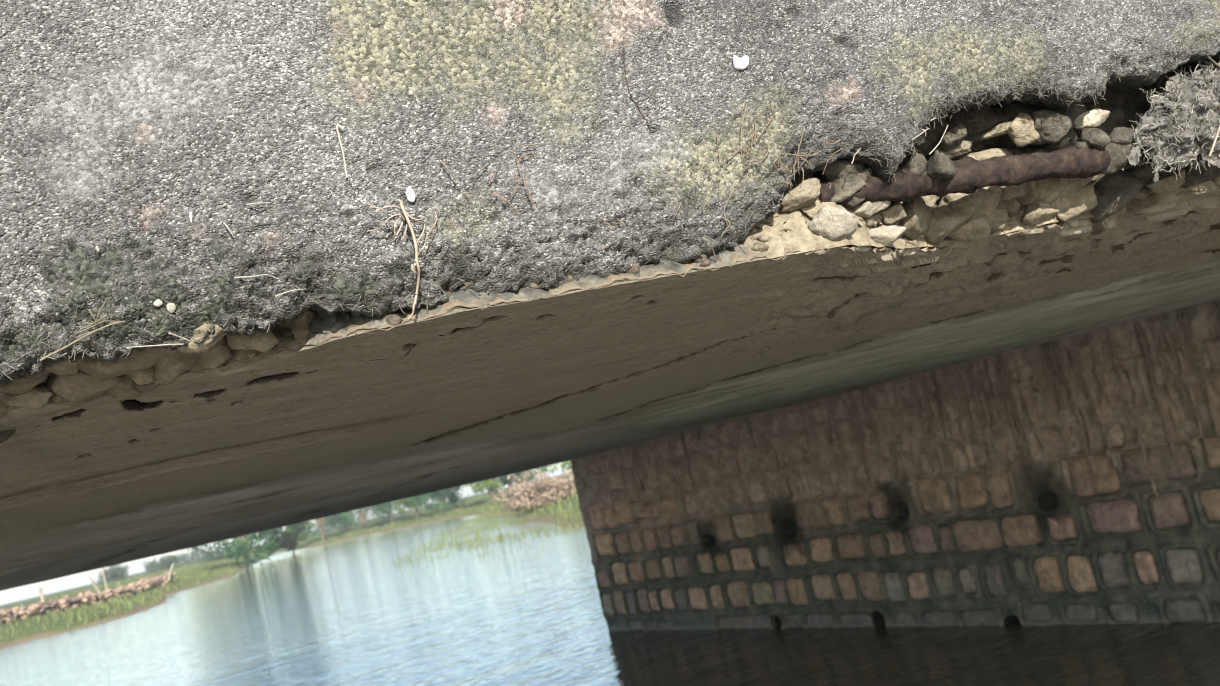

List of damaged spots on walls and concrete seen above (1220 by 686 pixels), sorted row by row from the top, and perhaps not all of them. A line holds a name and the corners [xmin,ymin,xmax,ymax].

water stain [501,0,521,22]
spalling [0,62,1220,444]